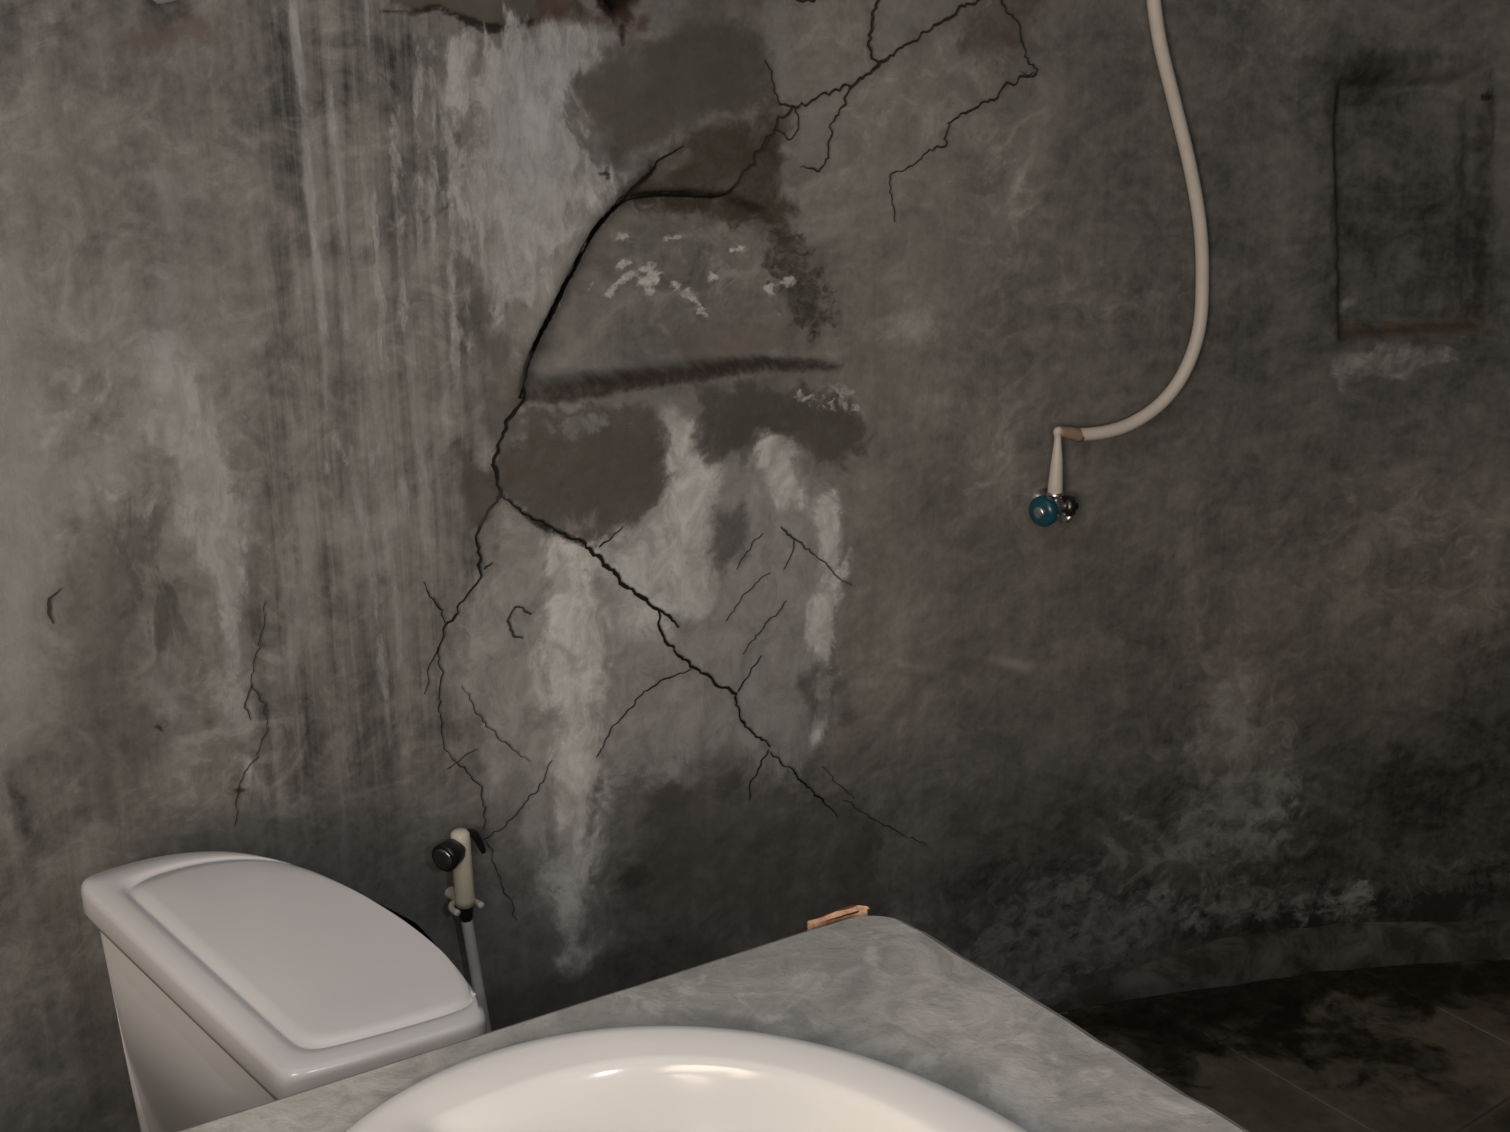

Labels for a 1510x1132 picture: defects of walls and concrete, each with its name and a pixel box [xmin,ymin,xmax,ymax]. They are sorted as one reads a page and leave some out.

water stain [289,0,302,100]
spalling [411,5,532,34]
spalling [597,0,637,23]
water stain [304,142,327,333]
water stain [418,13,863,973]
crack [423,0,1038,920]